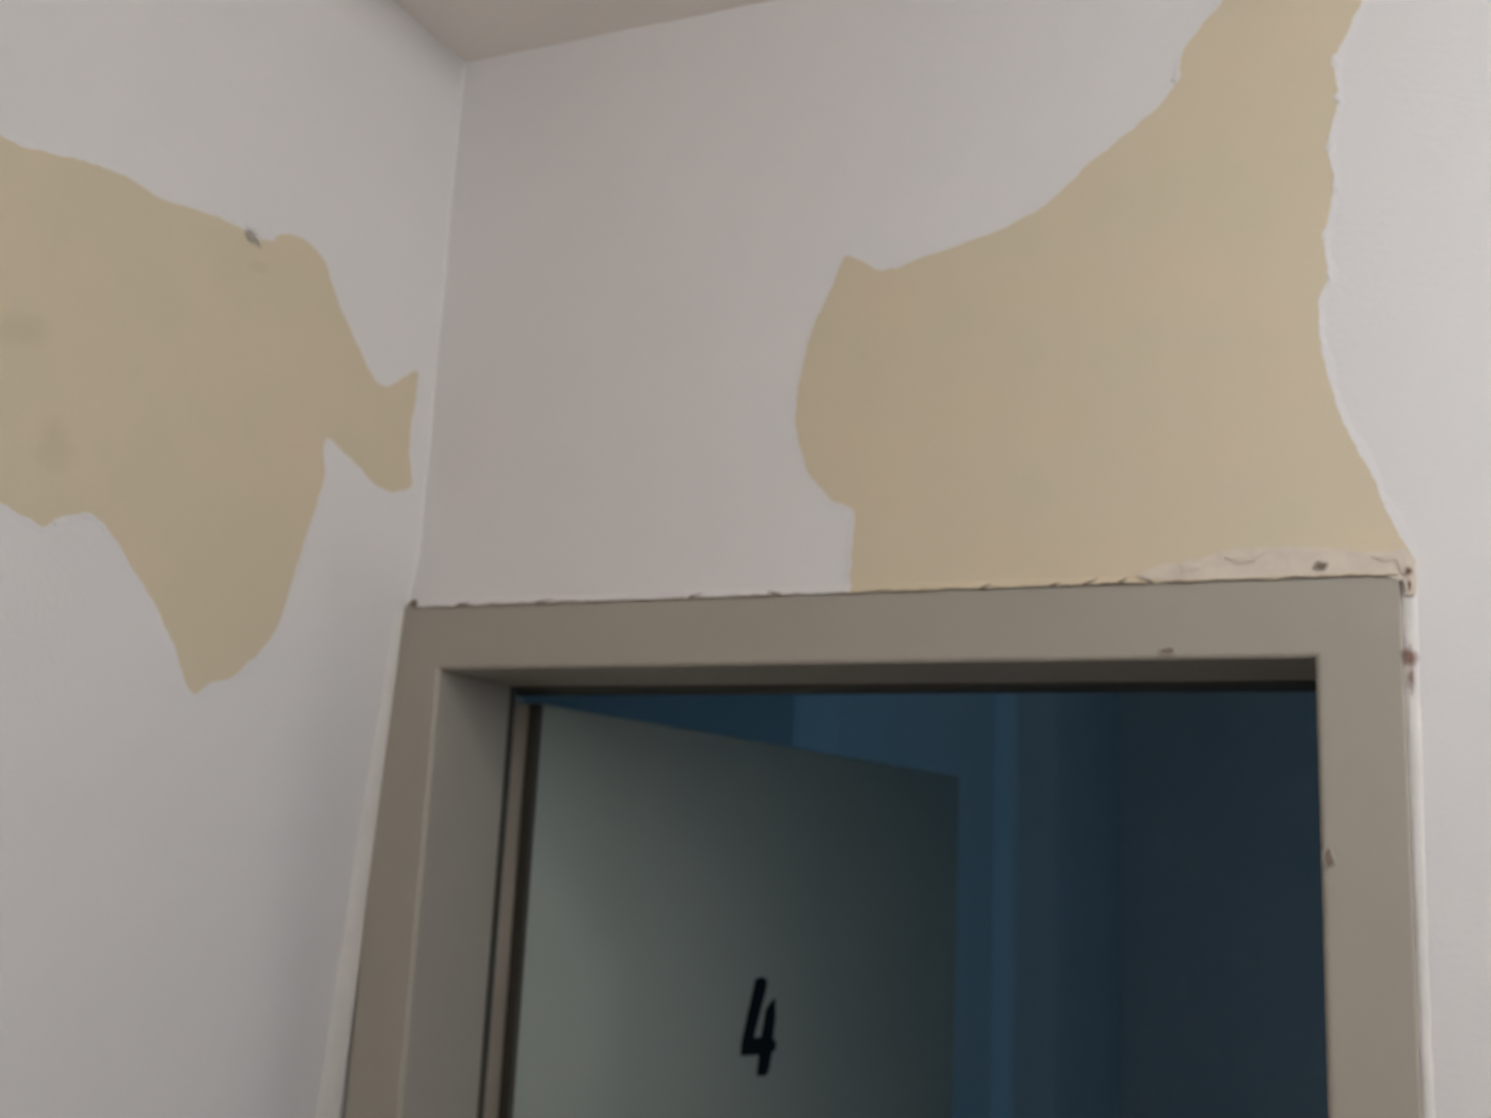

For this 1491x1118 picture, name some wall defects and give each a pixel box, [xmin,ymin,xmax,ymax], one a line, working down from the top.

peeling [0,128,421,701]
peeling [789,0,1420,596]